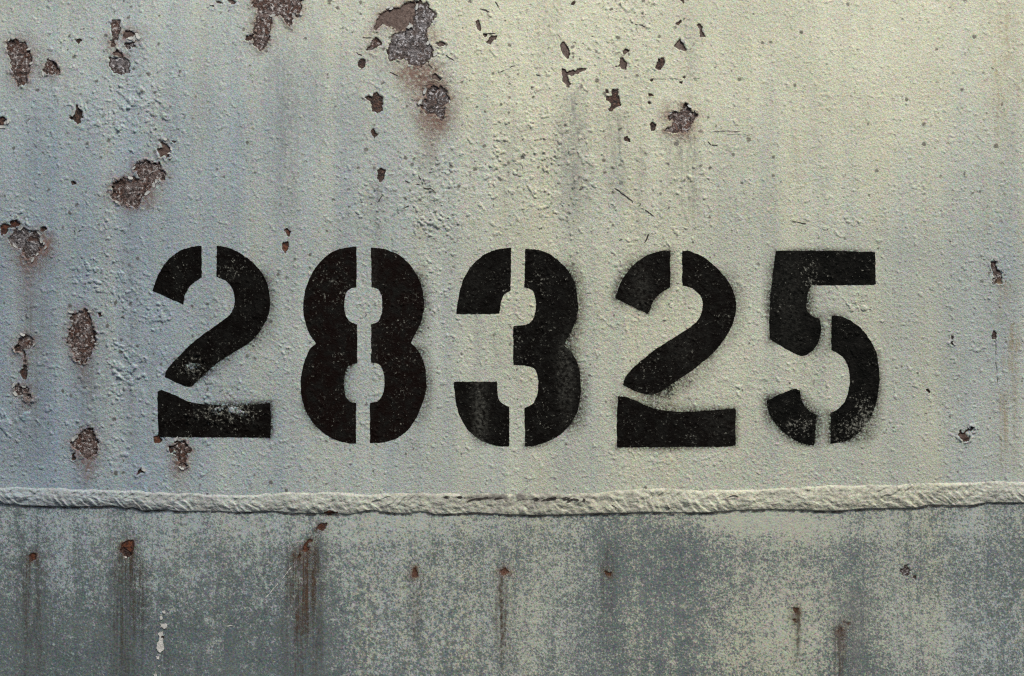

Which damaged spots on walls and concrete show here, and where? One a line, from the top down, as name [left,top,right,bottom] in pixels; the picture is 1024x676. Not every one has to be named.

peeling [362,92,383,113]
peeling [157,137,176,159]
rust [118,540,134,600]
rust [290,510,338,647]